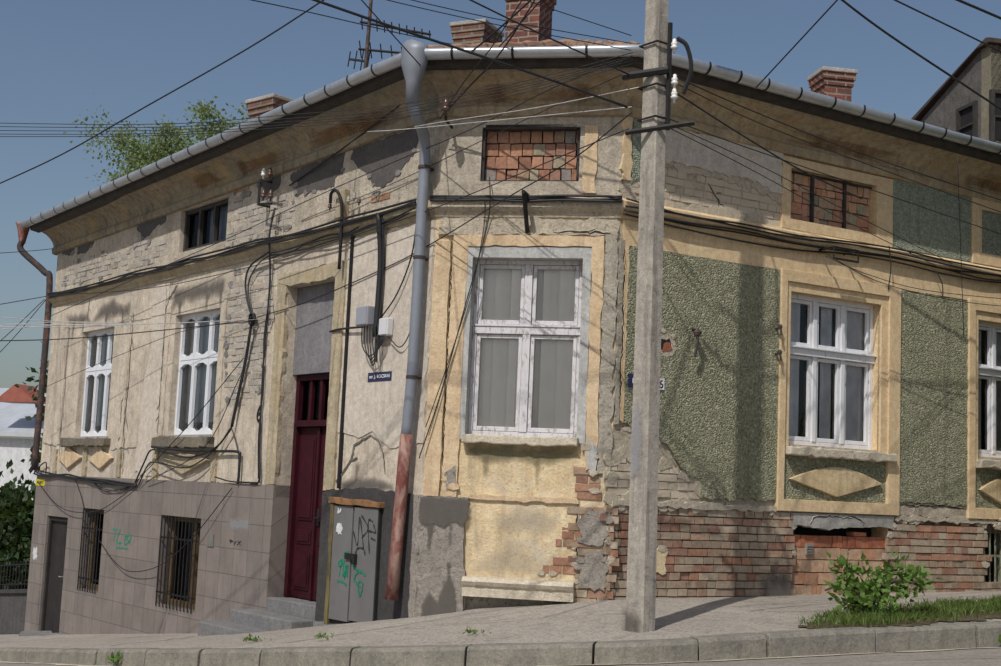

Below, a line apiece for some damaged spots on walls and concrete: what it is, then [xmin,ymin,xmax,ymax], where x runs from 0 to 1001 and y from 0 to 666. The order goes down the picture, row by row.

flaking render [225,127,419,247]
flaking render [664,161,781,227]
damp [70,301,129,328]
damp [173,281,224,312]
flaking render [538,426,632,603]
flaking render [656,439,797,599]